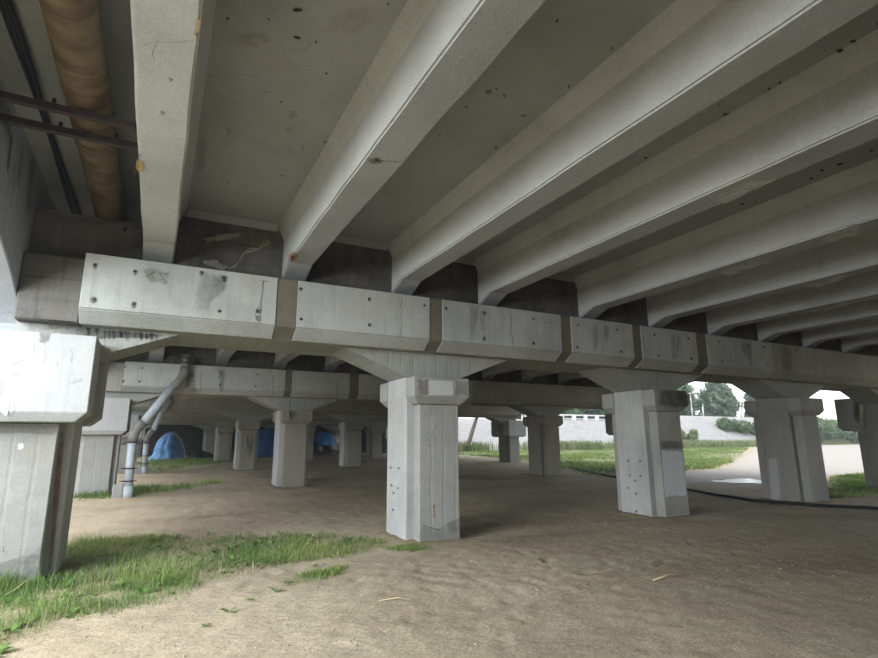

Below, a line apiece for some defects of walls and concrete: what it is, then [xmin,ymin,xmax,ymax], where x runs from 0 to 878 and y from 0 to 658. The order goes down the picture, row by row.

crack [255,280,268,323]